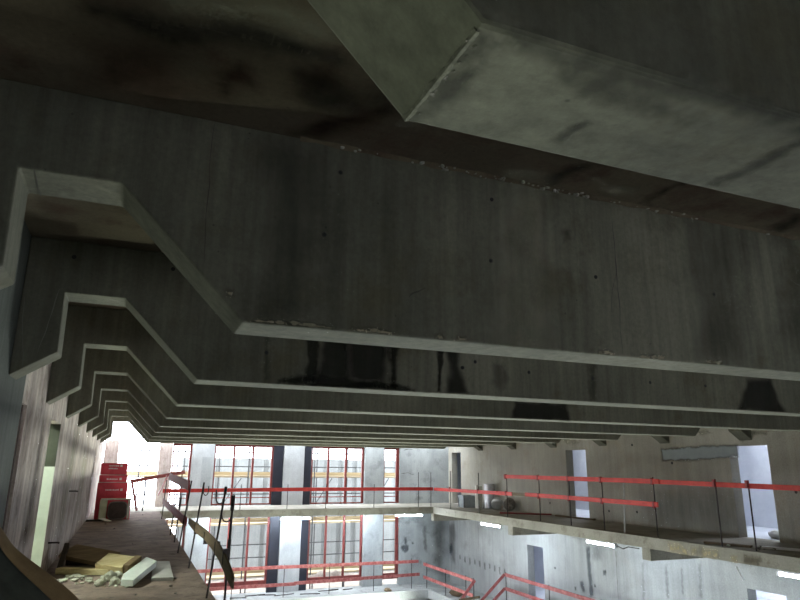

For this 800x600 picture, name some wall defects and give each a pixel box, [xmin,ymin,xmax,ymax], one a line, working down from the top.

damp [279,340,415,392]
damp [437,351,467,393]
damp [512,402,570,421]
damp [739,380,784,412]